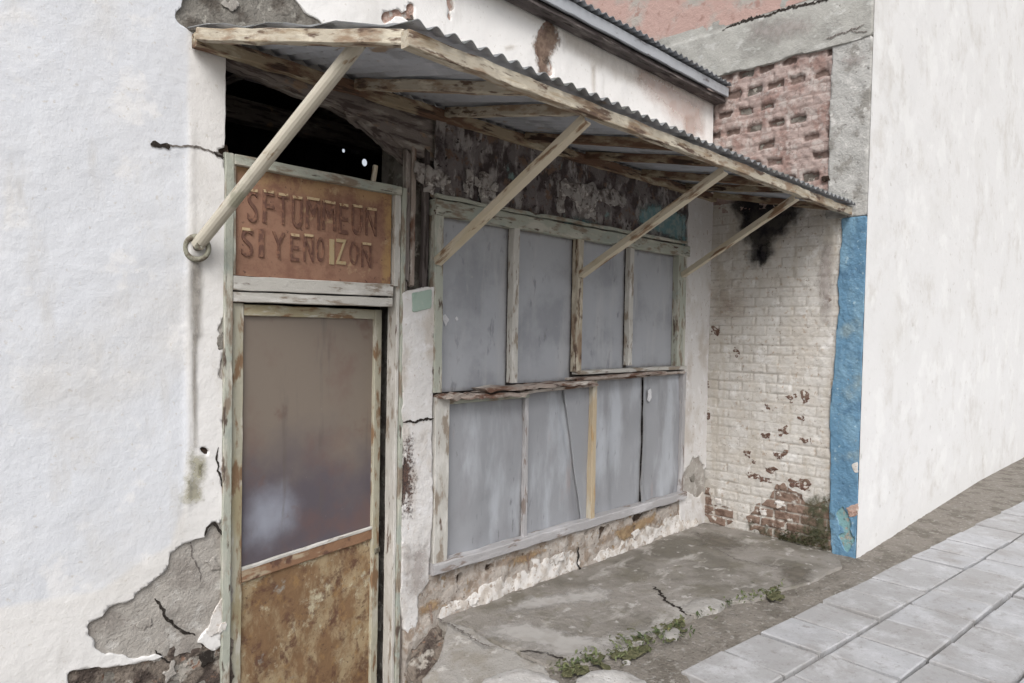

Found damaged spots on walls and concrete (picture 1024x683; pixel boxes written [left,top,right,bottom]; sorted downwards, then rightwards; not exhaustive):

flaking render [175,0,321,33]
flaking render [534,21,560,76]
crack [150,141,224,158]
damp [759,243,768,266]
damp [192,262,200,419]
crack [403,416,434,424]
damp [187,458,203,500]
crack [214,447,222,487]
flaking render [593,450,859,562]
flaking render [67,521,234,683]
peeling [439,550,580,619]
crack [653,586,691,616]